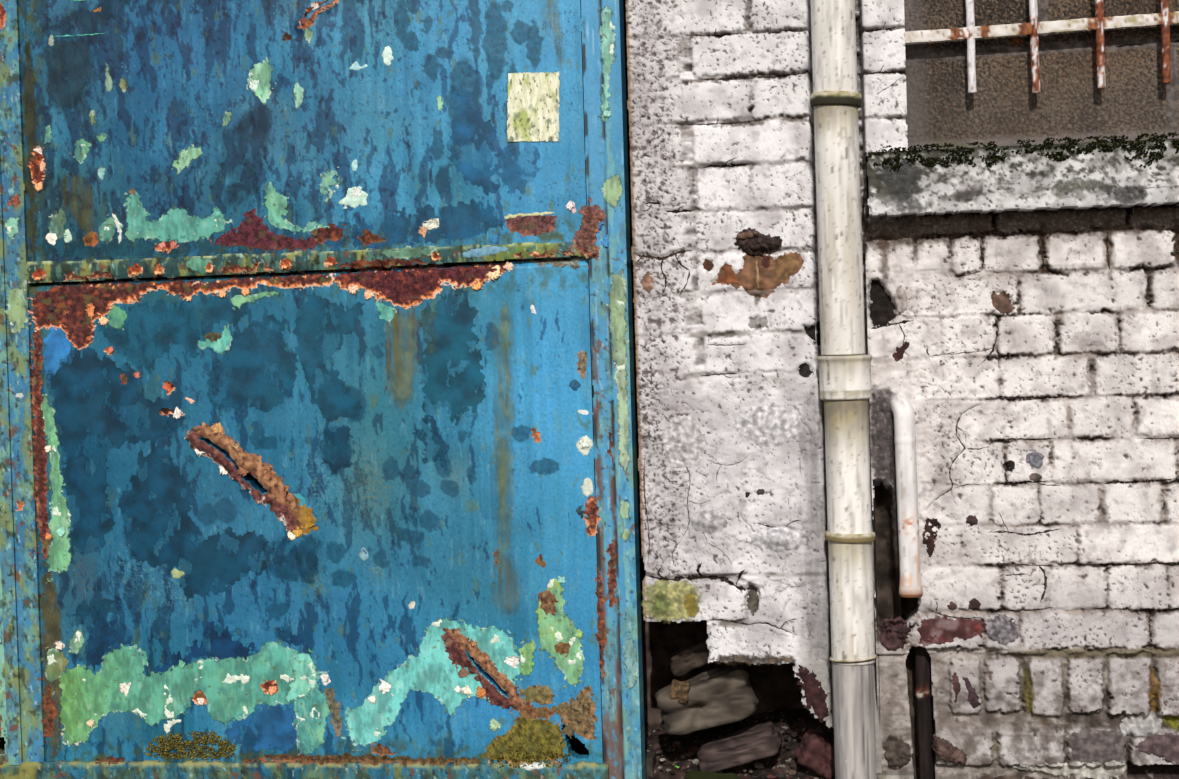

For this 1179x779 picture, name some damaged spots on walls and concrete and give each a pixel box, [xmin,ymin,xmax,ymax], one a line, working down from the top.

peeling [247,58,275,105]
peeling [98,188,232,245]
peeling [184,257,215,276]
spalling [866,277,908,326]
rust [0,43,618,768]
crack [643,457,799,635]
peeling [40,630,331,755]
peeling [341,569,585,752]
peeling [622,638,638,689]
spalling [655,636,782,772]
spalling [794,665,835,779]